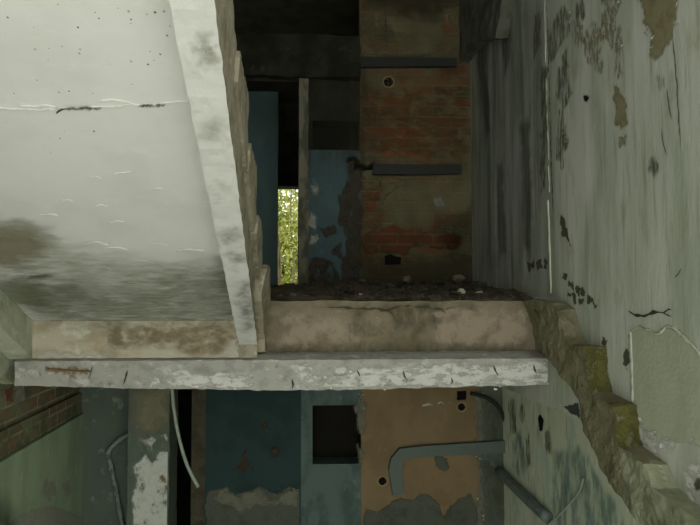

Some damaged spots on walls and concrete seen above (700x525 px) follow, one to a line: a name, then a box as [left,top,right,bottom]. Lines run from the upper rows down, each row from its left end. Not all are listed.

flaking render [640,0,679,59]
crack [0,98,188,114]
peeling [549,0,624,166]
flaking render [613,87,628,148]
peeling [309,161,364,284]
water stain [0,227,226,353]
crack [629,308,672,317]
rust [45,367,90,378]
flaking render [623,325,700,453]
peeling [132,451,168,525]
peeling [205,486,300,525]
flaking render [363,492,479,525]